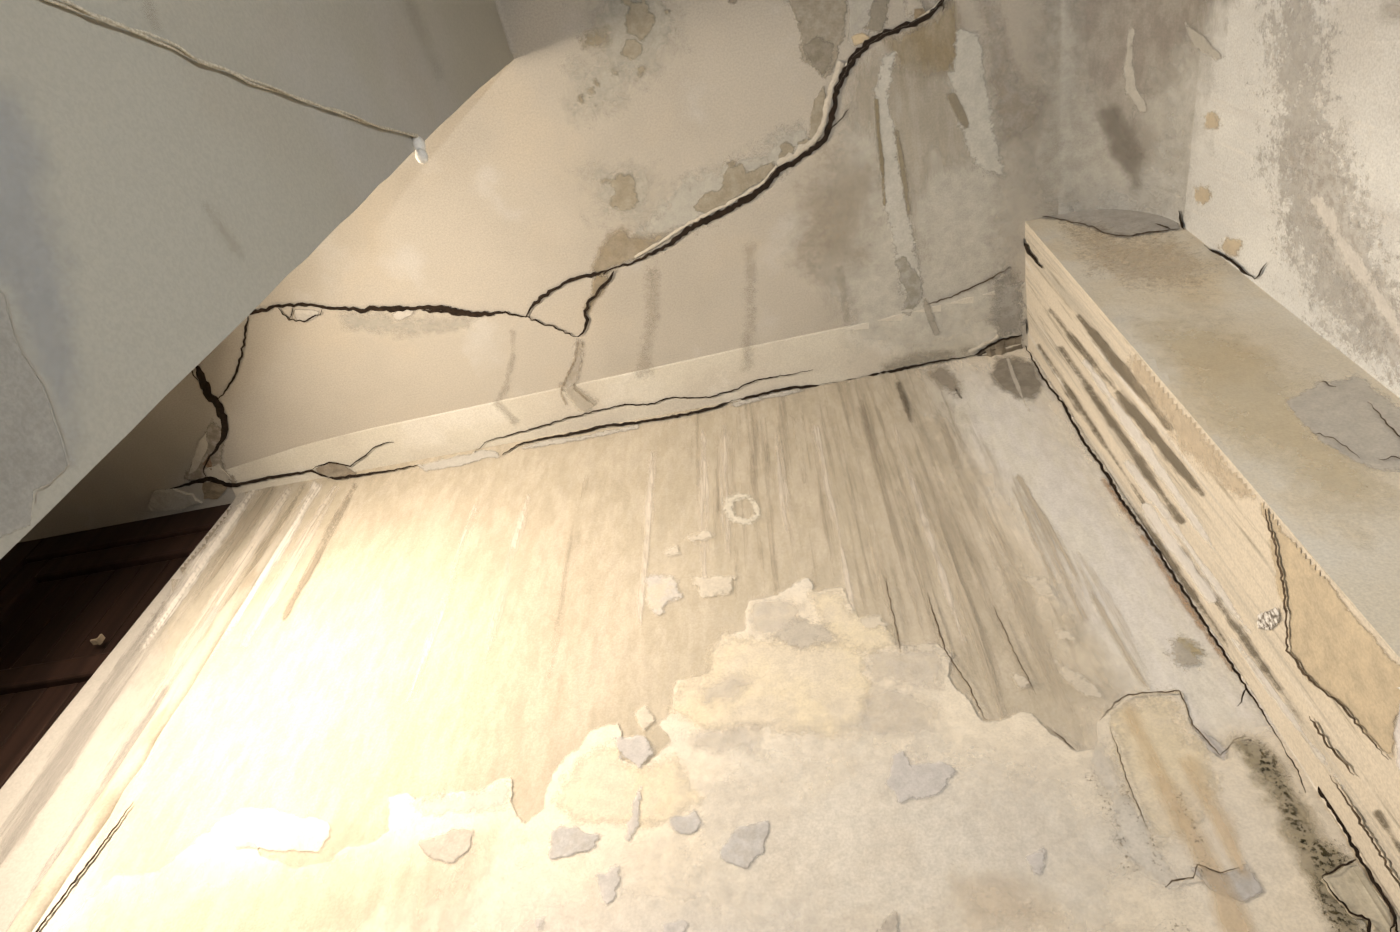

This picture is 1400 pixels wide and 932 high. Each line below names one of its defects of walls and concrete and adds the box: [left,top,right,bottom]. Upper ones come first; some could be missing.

crack [170,0,945,489]
damp [585,230,662,311]
peeling [597,0,869,236]
damp [827,0,1042,341]
damp [1075,0,1221,173]
peeling [1256,0,1400,471]
peeling [59,574,1339,932]
damp [115,315,1364,932]
crack [475,314,1400,932]
damp [1374,810,1400,852]